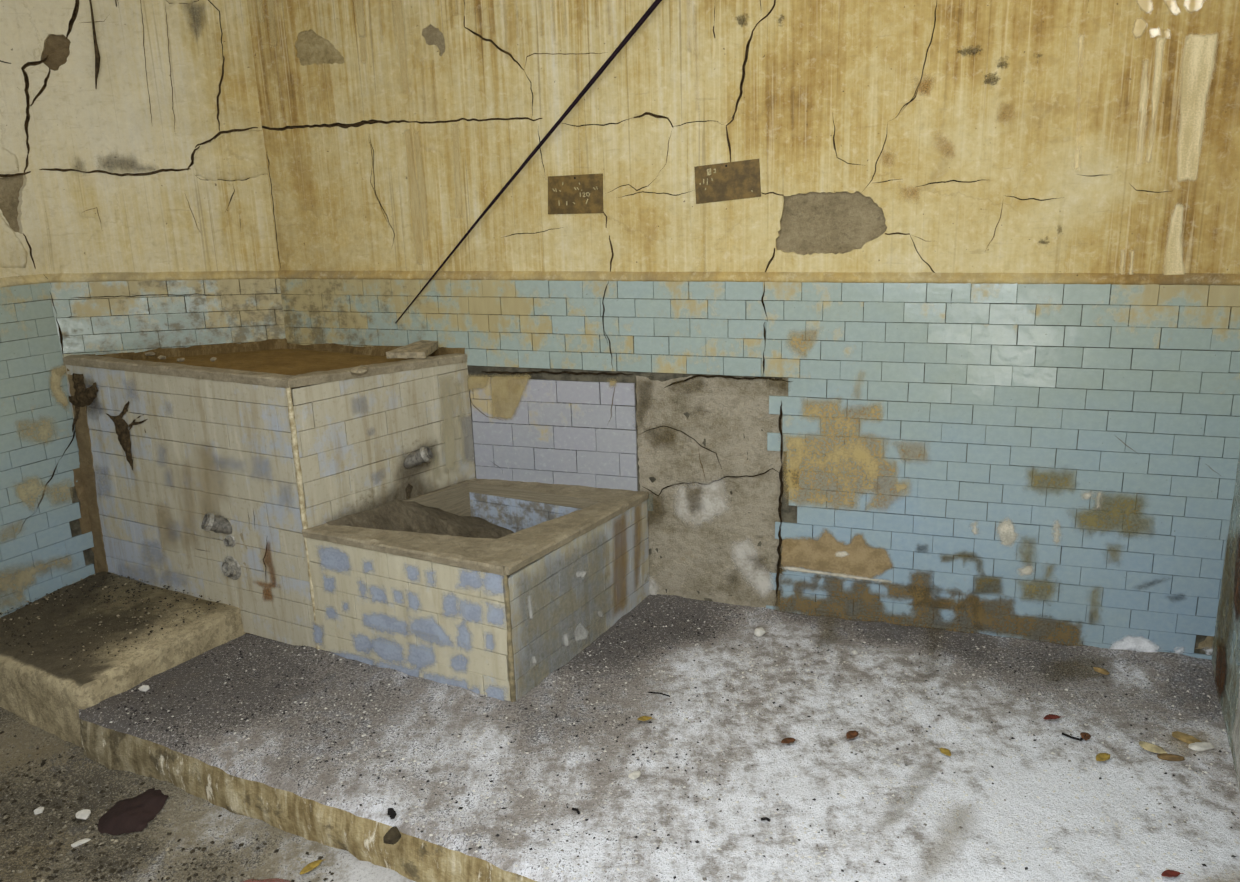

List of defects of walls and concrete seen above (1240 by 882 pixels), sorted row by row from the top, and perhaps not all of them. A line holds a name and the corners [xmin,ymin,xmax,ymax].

spalling [295,30,345,66]
crack [832,3,1100,251]
leakage [1137,38,1165,164]
leakage [1178,34,1217,181]
crack [0,0,776,425]
spalling [776,191,887,255]
leakage [1165,204,1184,275]
flaking render [636,376,788,607]
crack [641,248,792,598]
rust [261,545,275,599]
peeling [336,562,504,701]
rust [1215,535,1240,699]